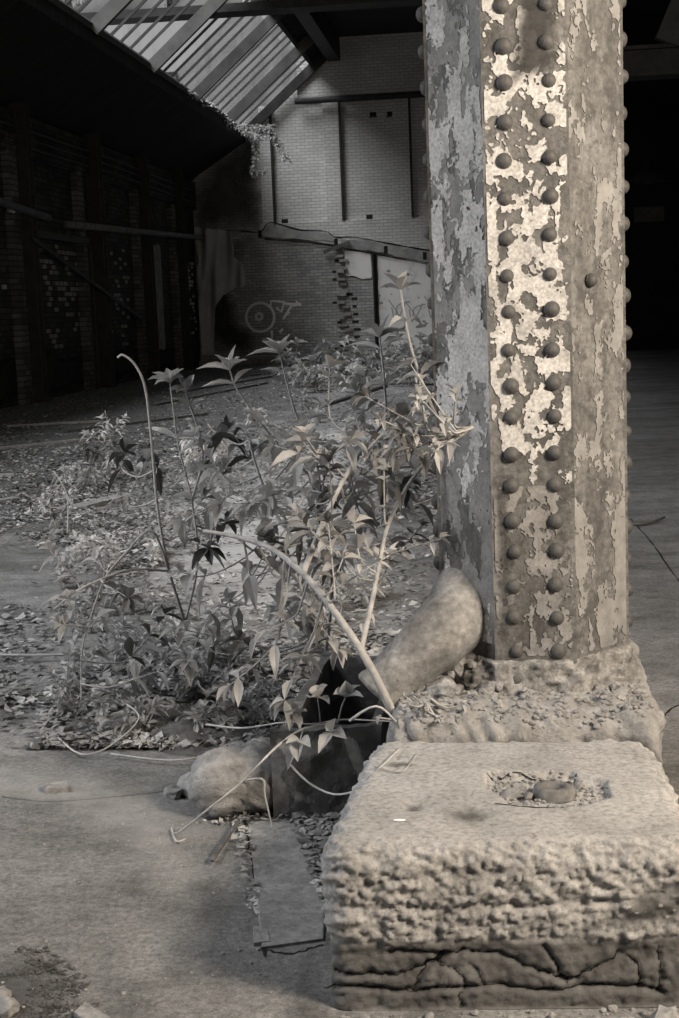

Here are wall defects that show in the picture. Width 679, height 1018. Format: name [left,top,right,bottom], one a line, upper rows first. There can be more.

spalling [332,247,361,356]
peeling [378,0,627,656]
crack [630,519,679,581]
crack [244,820,255,887]
crack [261,942,662,1008]